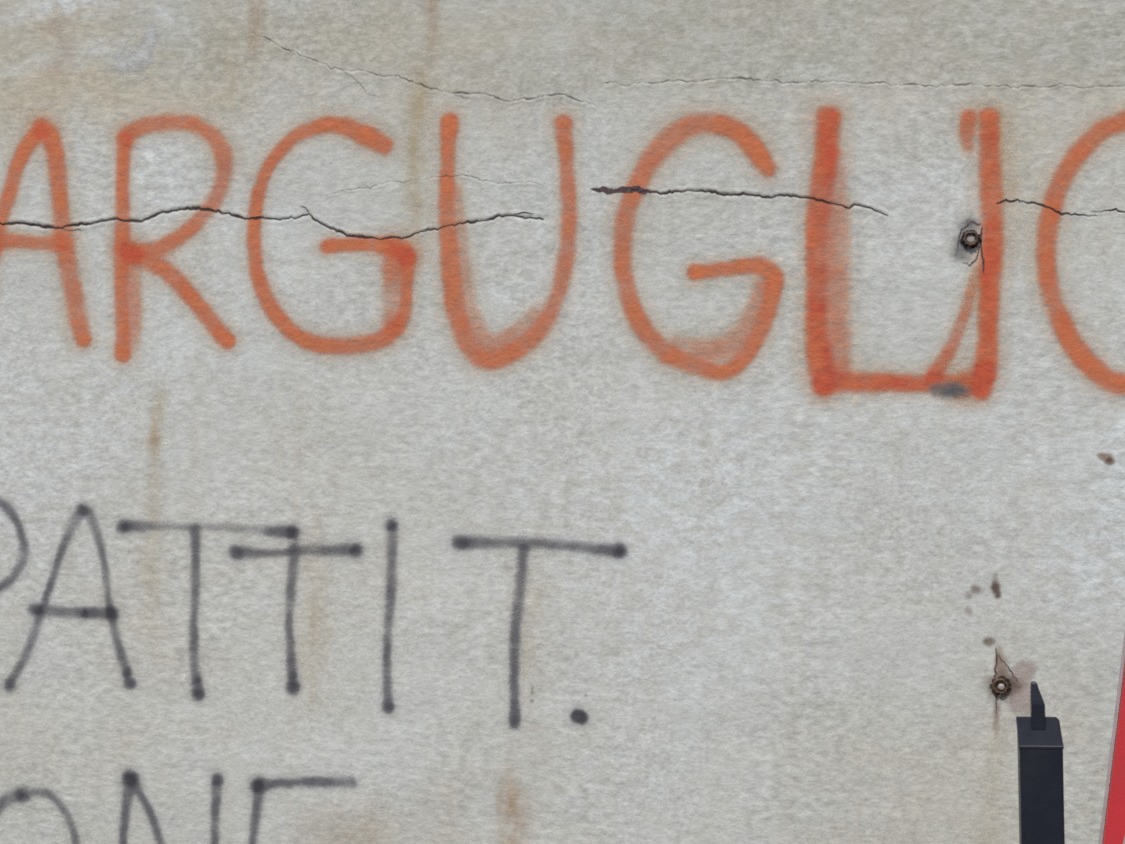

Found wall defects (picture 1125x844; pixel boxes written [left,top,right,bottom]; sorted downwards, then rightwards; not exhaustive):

crack [0,201,545,243]
crack [590,183,889,223]
crack [996,198,1125,223]
rust [991,662,1034,713]